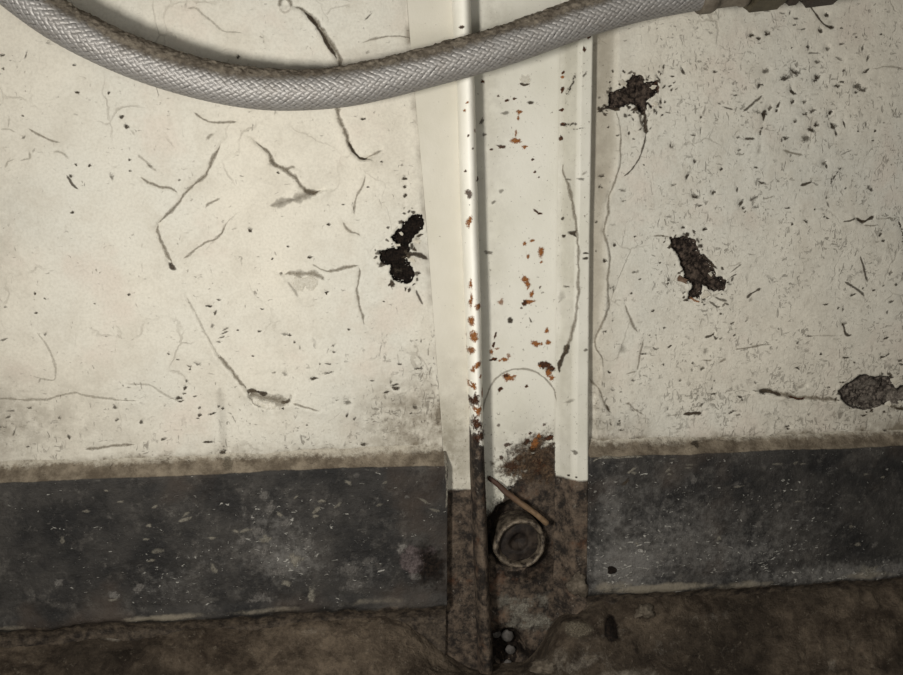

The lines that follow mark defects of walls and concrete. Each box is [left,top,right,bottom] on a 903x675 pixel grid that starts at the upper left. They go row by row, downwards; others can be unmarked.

crack [296,7,341,66]
spalling [597,65,684,140]
crack [336,108,376,160]
crack [258,144,318,206]
crack [143,146,220,270]
spalling [374,177,427,304]
rust [520,276,541,309]
spalling [656,226,740,315]
rust [466,279,510,443]
rust [538,361,555,380]
spalling [828,360,903,417]
rust [492,423,556,484]